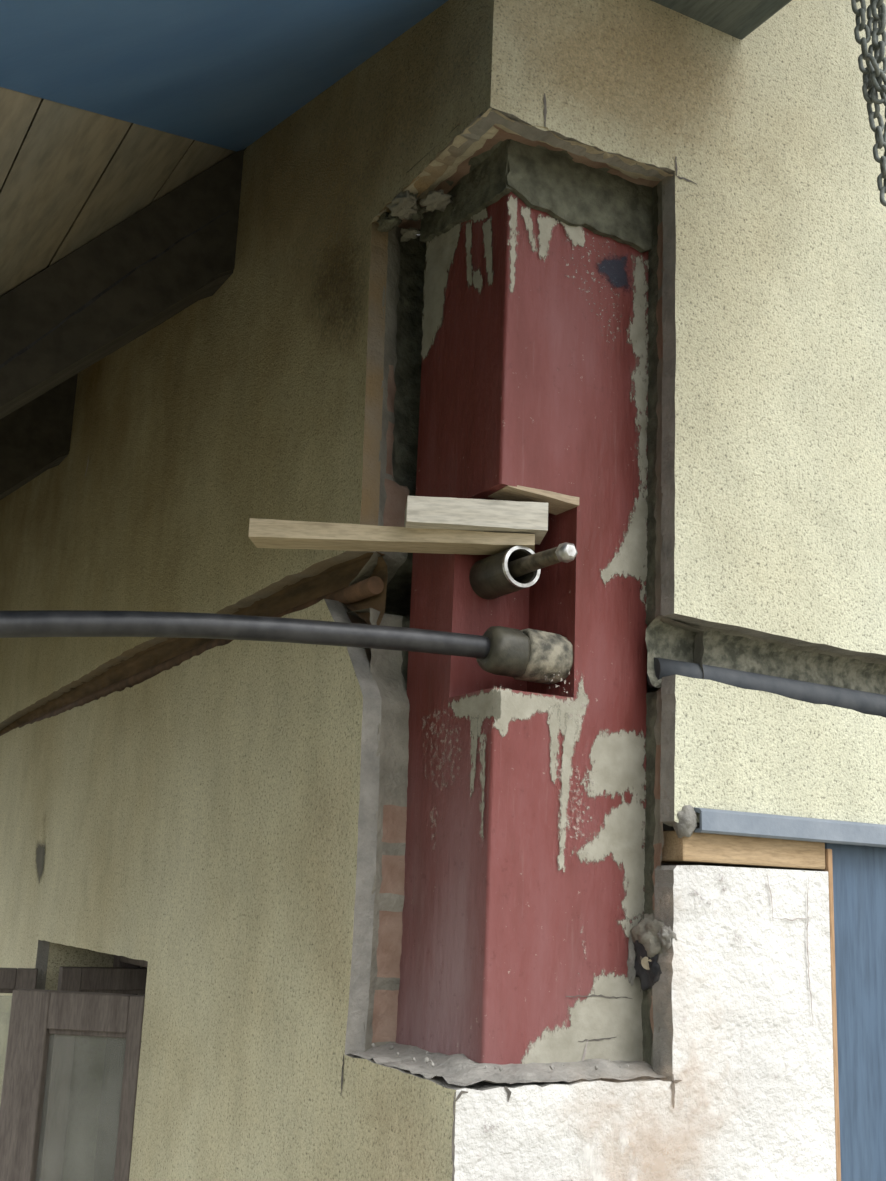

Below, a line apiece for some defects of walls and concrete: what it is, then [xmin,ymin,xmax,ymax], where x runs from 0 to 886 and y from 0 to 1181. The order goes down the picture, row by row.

peeling [377,189,462,360]
peeling [601,255,649,610]
peeling [522,729,677,1064]